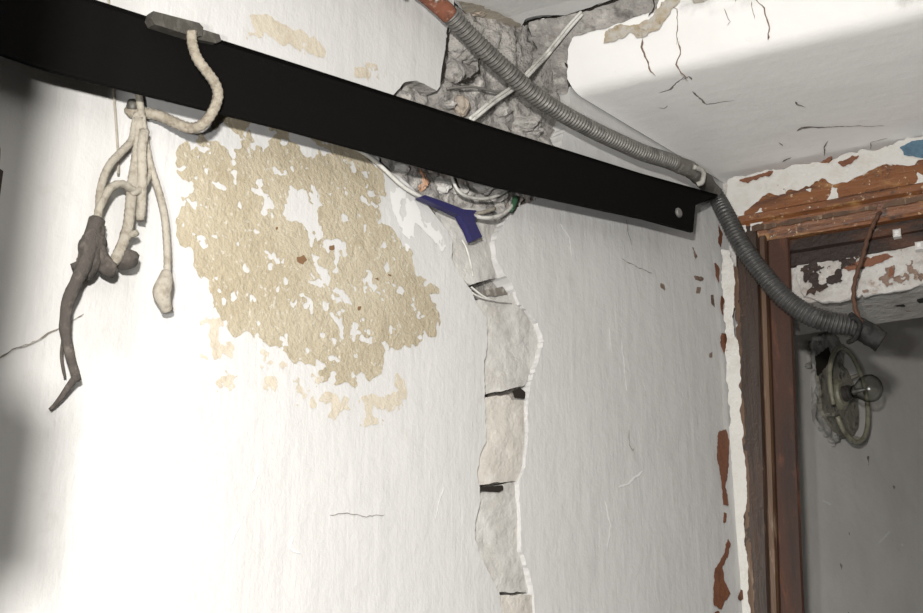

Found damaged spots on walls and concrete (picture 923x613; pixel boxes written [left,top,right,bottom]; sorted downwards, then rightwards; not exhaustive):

flaking render [394,27,557,146]
spalling [454,0,680,101]
crack [523,0,619,26]
crack [641,6,735,109]
crack [724,0,770,39]
peeling [726,136,923,232]
peeling [175,115,539,427]
flaking render [791,246,923,304]
peeling [475,292,539,613]
peeling [709,226,754,613]